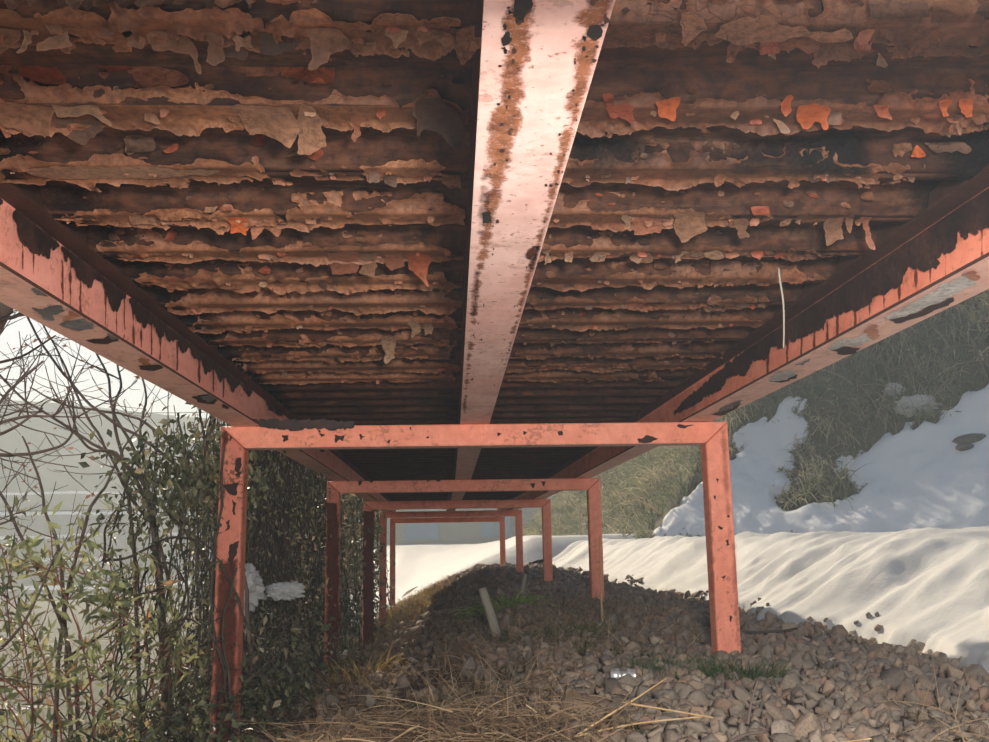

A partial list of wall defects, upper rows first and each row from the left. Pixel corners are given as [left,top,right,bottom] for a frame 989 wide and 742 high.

peeling [601,0,989,68]
corrosion [61,261,82,312]
peeling [0,0,482,397]
corrosion [463,0,535,413]
corrosion [501,0,611,365]
peeling [503,79,989,428]
peeling [192,394,230,409]
corrosion [223,457,242,530]
peeling [253,401,365,443]
peeling [637,435,658,443]
corrosion [213,541,239,742]
corrosion [362,511,375,647]